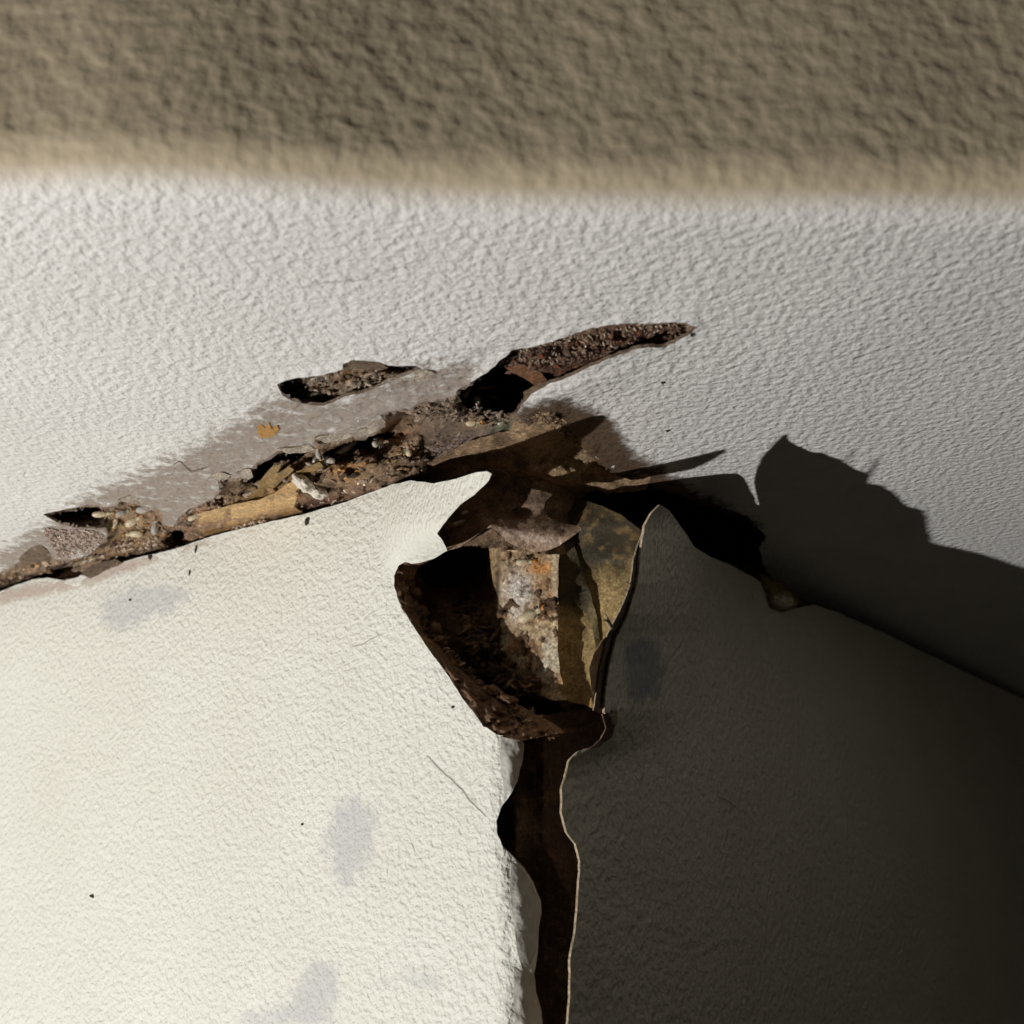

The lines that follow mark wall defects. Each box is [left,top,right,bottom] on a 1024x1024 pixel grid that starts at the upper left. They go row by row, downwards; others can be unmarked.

spalling [279,360,436,403]
spalling [456,322,693,418]
peeling [258,423,279,438]
spalling [44,527,103,560]
spalling [727,556,770,582]
spalling [394,470,657,749]
crack [427,707,605,1024]